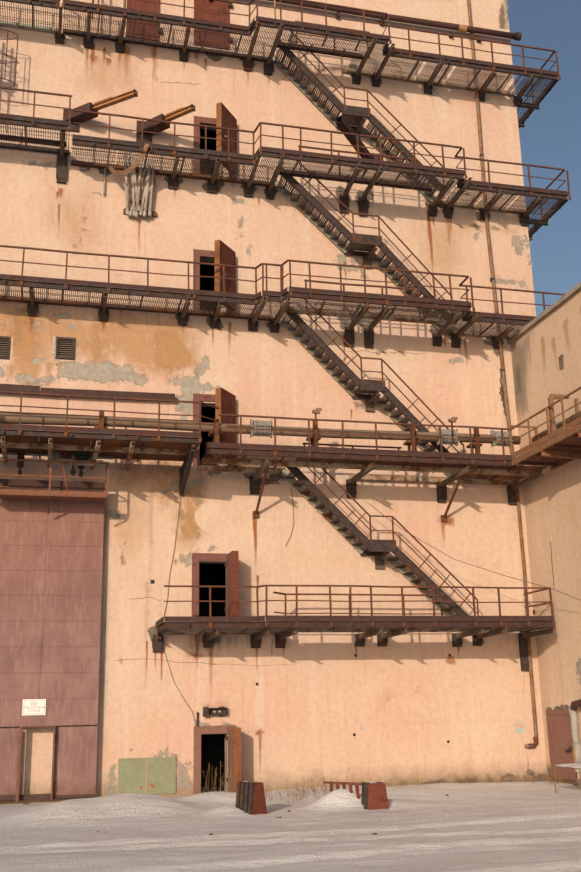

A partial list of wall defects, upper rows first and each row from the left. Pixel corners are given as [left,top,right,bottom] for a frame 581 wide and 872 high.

flaking render [511,235,533,265]
flaking render [0,312,148,387]
spalling [242,473,285,485]